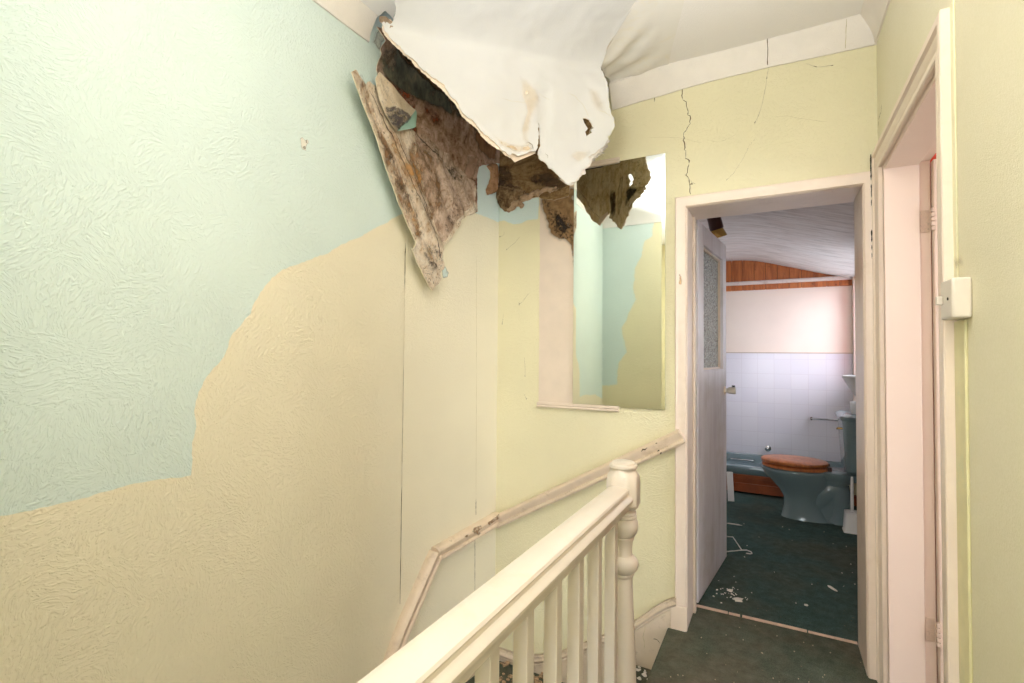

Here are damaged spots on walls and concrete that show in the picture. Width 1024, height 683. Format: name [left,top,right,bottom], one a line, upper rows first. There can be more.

damp [382,48,464,119]
damp [361,81,462,268]
damp [474,127,514,187]
damp [531,173,574,257]
crack [649,89,729,194]